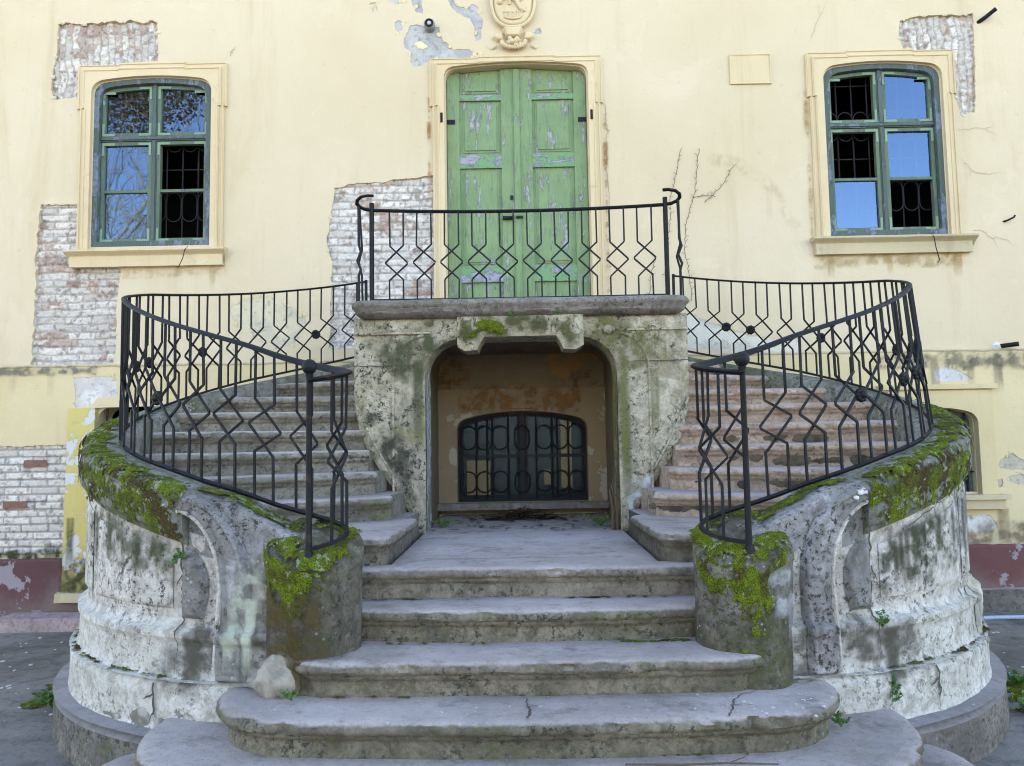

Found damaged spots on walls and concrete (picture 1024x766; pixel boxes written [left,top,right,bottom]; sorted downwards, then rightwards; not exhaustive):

flaking render [50,20,161,100]
peeling [370,0,483,67]
flaking render [897,13,976,118]
flaking render [32,203,123,408]
flaking render [327,176,434,349]
damp [946,352,1024,376]
flaking render [0,445,66,557]
crack [728,688,761,716]